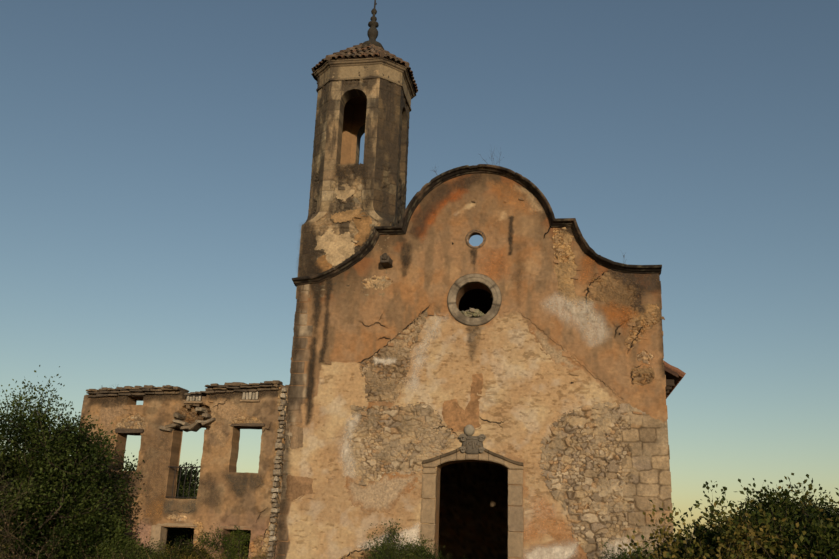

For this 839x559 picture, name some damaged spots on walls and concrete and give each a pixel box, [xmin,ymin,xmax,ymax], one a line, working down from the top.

peeling [314,184,373,273]
flaking render [552,227,665,386]
peeling [176,395,262,430]
peeling [249,305,674,559]
water stain [527,544,576,559]